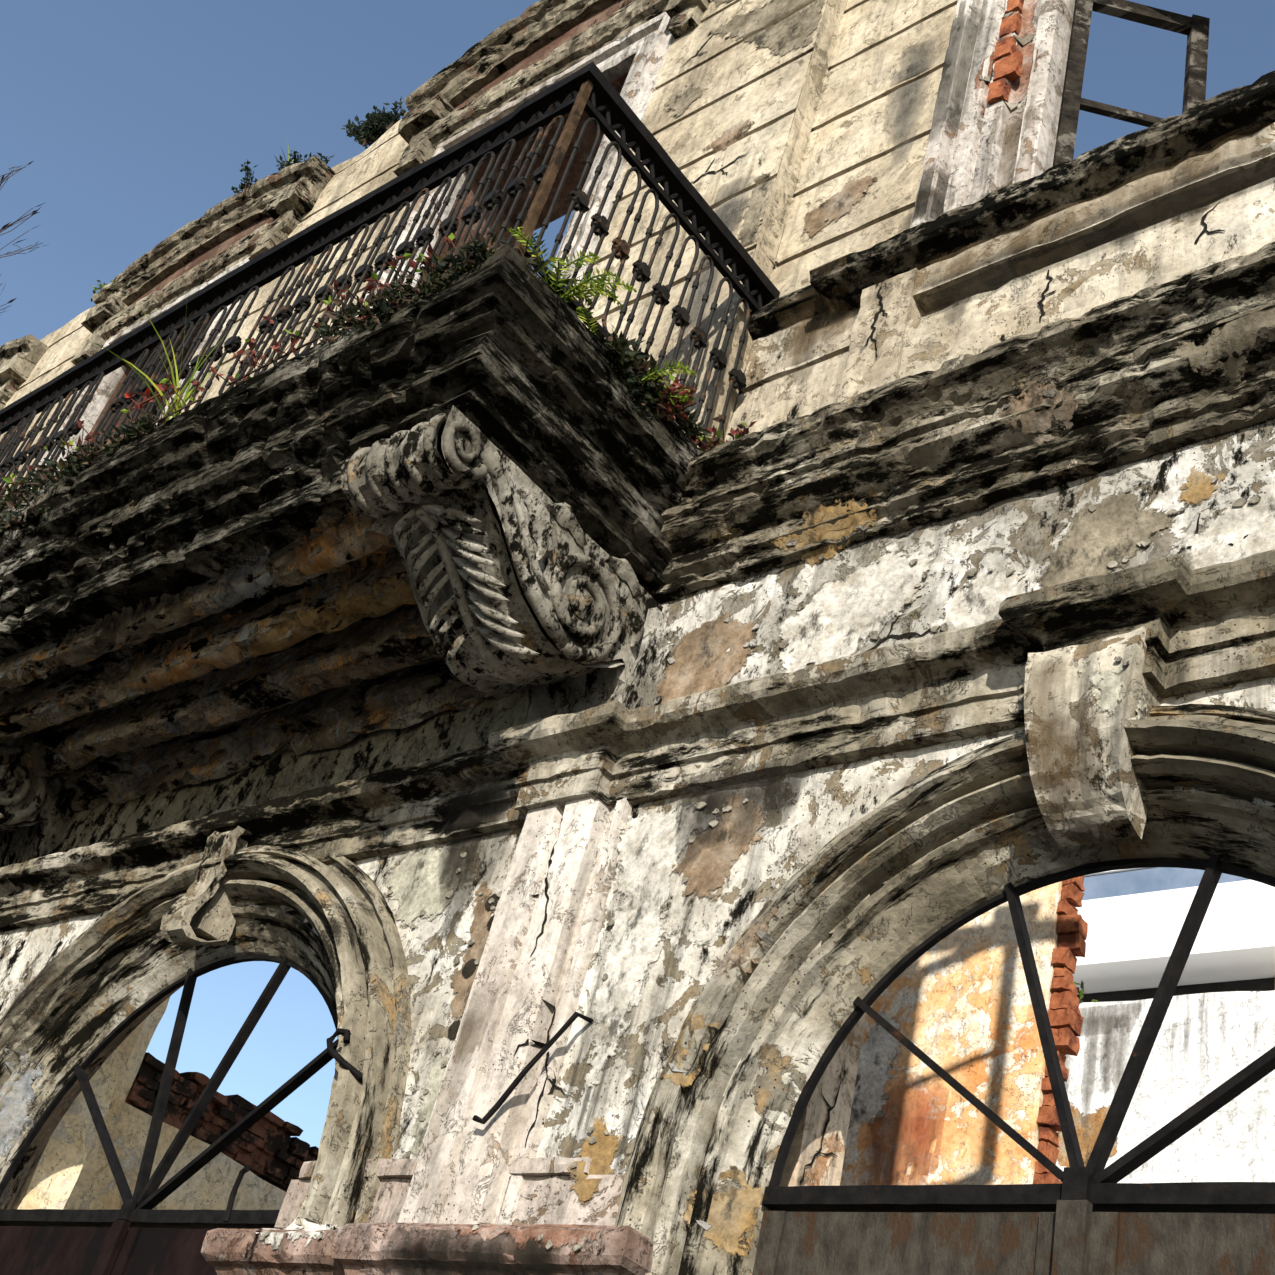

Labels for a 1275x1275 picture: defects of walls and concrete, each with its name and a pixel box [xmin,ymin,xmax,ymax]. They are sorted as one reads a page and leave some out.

flaking render [974,0,1041,114]
crack [1194,201,1225,245]
crack [859,286,887,358]
crack [1037,270,1056,322]
peeling [771,499,877,567]
peeling [928,467,1275,633]
peeling [654,613,760,705]
peeling [778,543,935,673]
leakage [446,772,499,906]
crack [530,818,563,956]
crack [514,999,566,1147]
peeling [684,1166,763,1257]